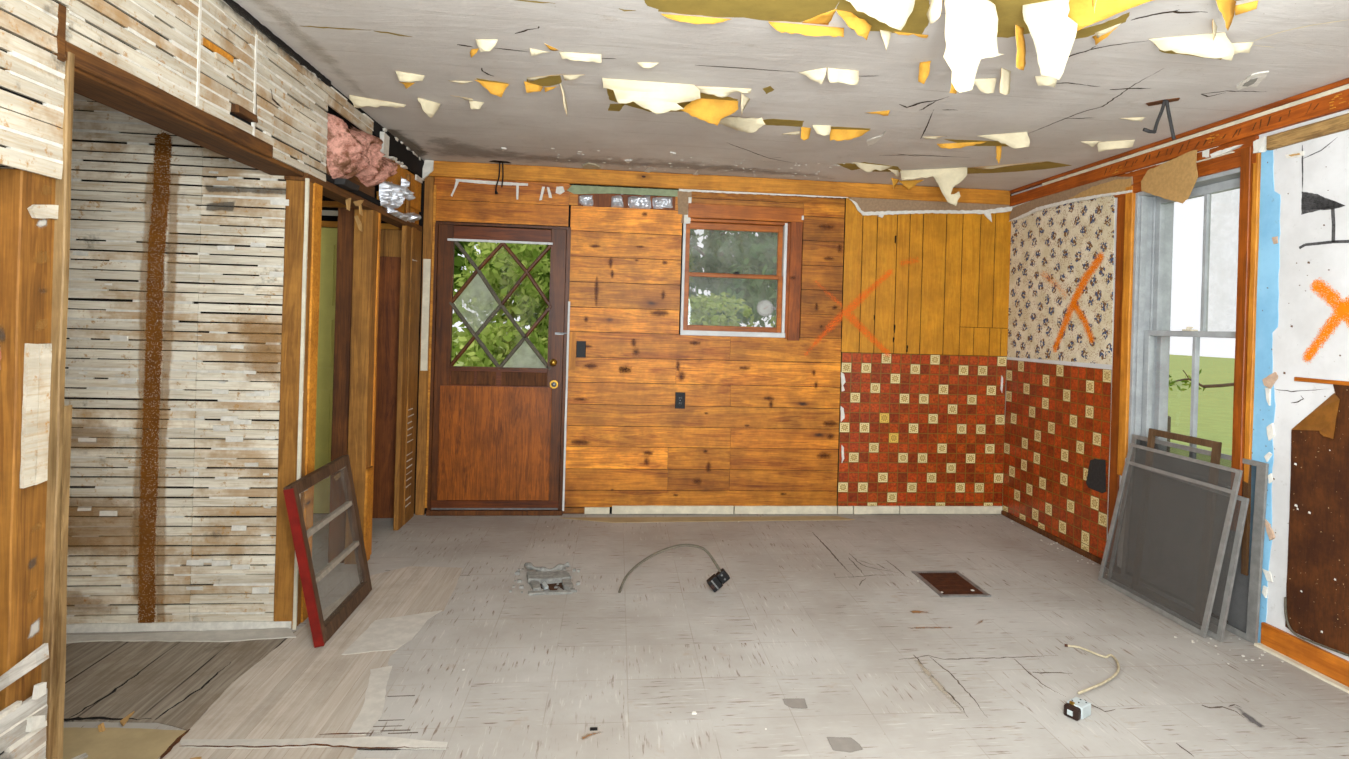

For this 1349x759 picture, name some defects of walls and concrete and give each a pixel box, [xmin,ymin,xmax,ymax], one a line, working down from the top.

crack [303,26,411,37]
crack [457,0,555,76]
crack [697,64,790,72]
crack [1030,10,1202,133]
crack [1201,90,1267,98]
flaking render [1236,71,1269,90]
spalling [1104,110,1290,175]
peeling [1263,372,1286,406]
peeling [1264,423,1275,484]
peeling [1262,569,1273,598]